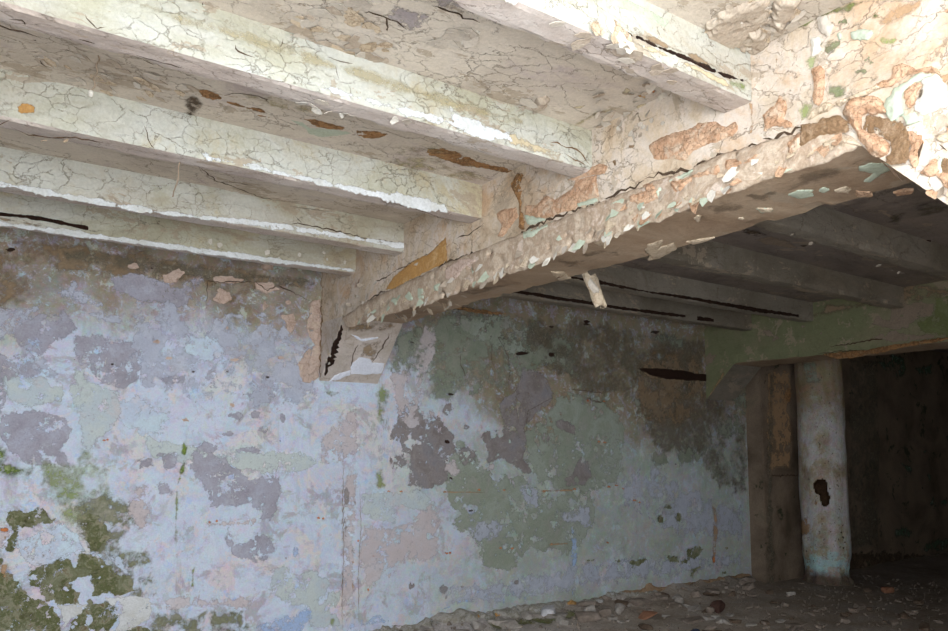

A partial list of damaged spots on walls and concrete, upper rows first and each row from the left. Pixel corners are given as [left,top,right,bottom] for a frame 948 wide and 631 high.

crack [365,11,407,31]
crack [435,6,480,23]
crack [0,119,97,142]
spalling [0,212,354,271]
spalling [0,181,404,249]
spalling [343,15,948,341]
crack [521,126,801,233]
crack [206,272,389,377]
flaking render [0,310,141,467]
flaking render [326,325,554,491]
damp [395,311,746,493]
flaking render [190,442,281,521]